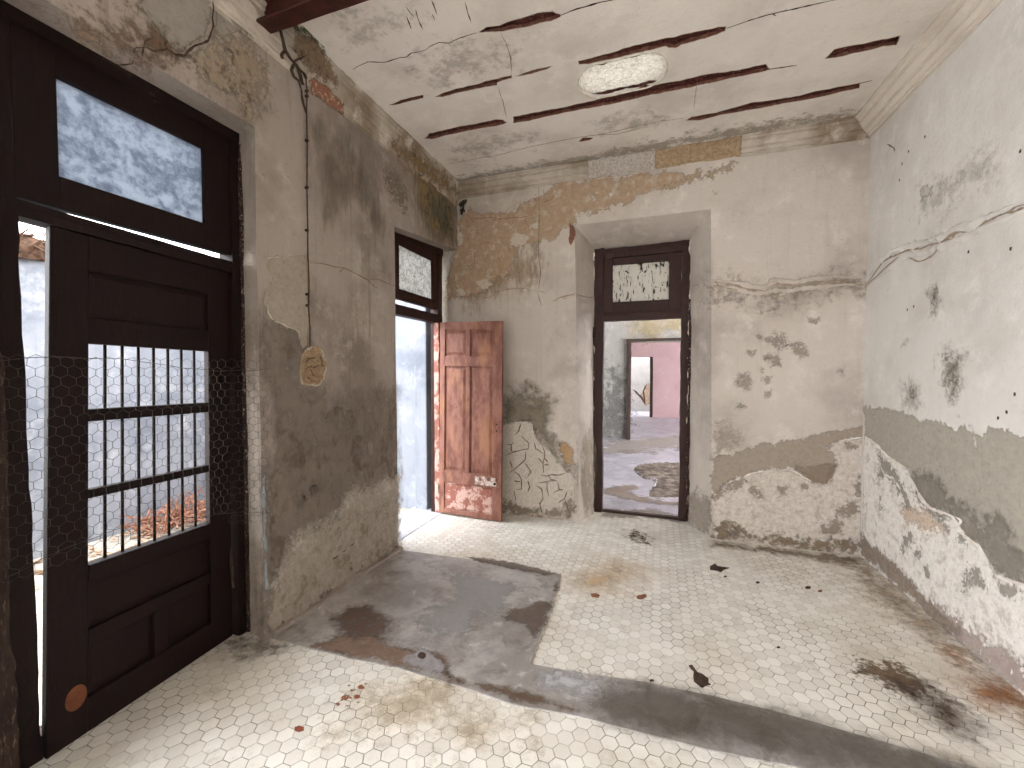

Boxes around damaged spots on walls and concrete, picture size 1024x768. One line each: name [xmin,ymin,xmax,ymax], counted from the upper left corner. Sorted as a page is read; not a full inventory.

crack [115,2,214,66]
crack [353,33,475,70]
crack [562,0,612,15]
crack [726,0,833,29]
damp [388,139,459,233]
flaking render [445,136,742,302]
crack [692,200,1024,297]
flaking render [263,254,327,387]
damp [225,308,402,659]
crack [506,424,570,512]
damp [502,364,1024,651]
peeling [708,436,1024,693]